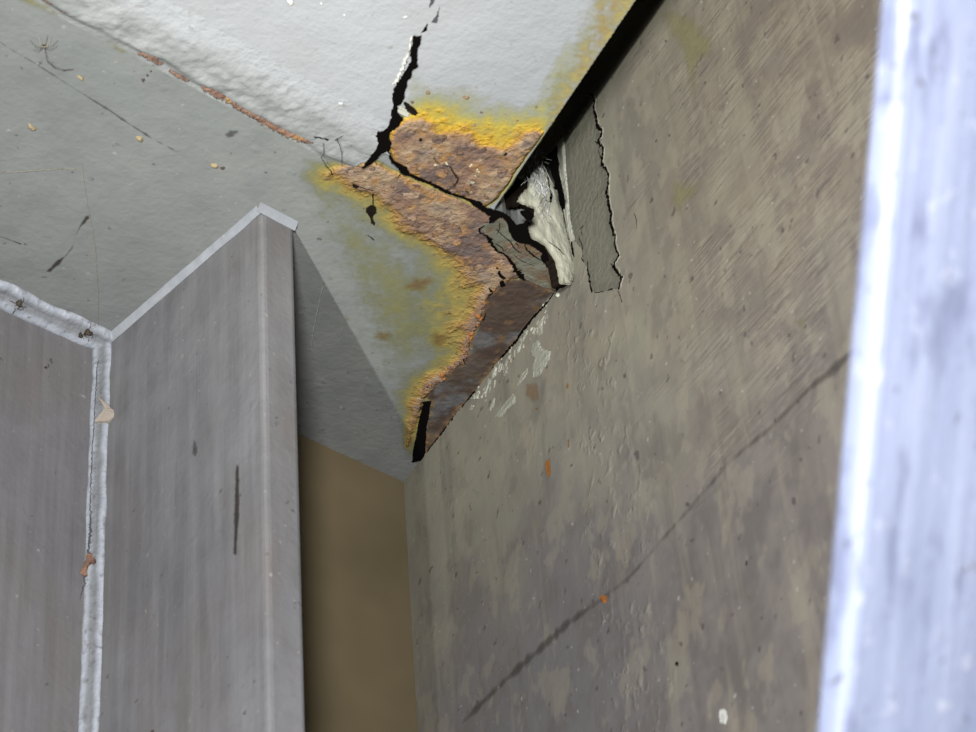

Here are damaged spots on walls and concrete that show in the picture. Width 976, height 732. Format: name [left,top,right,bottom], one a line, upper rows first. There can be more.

crack [412,391,475,463]
corrosion [307,0,635,452]
crack [314,0,637,368]
peeling [417,177,559,453]
peeling [555,97,620,292]